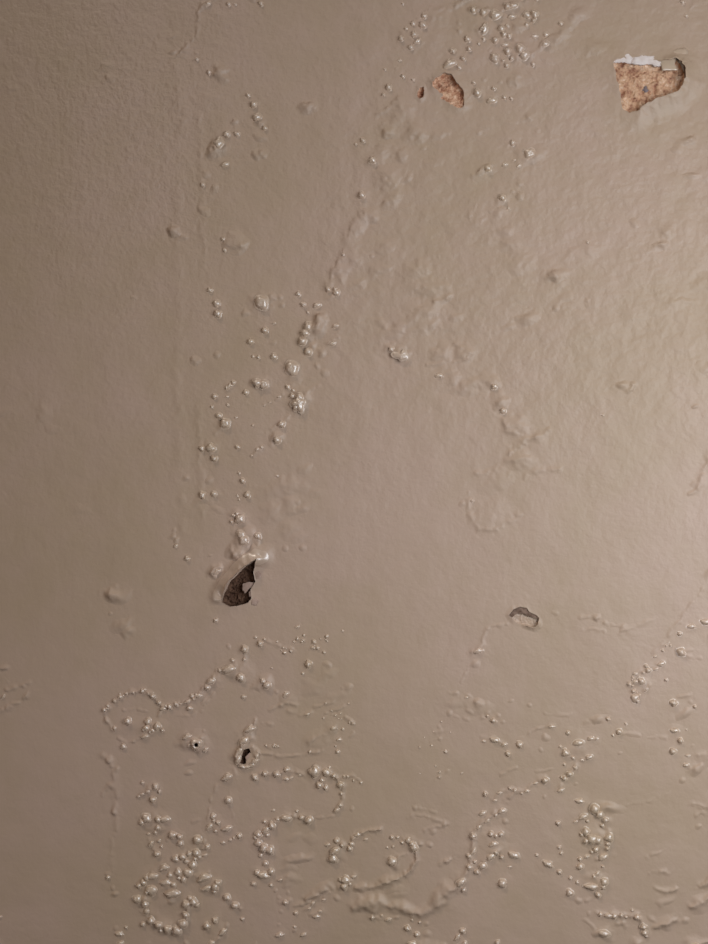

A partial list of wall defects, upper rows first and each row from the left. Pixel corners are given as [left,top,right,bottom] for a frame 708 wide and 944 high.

flaking render [412,66,473,116]
flaking render [591,40,708,137]
spalling [505,604,543,632]